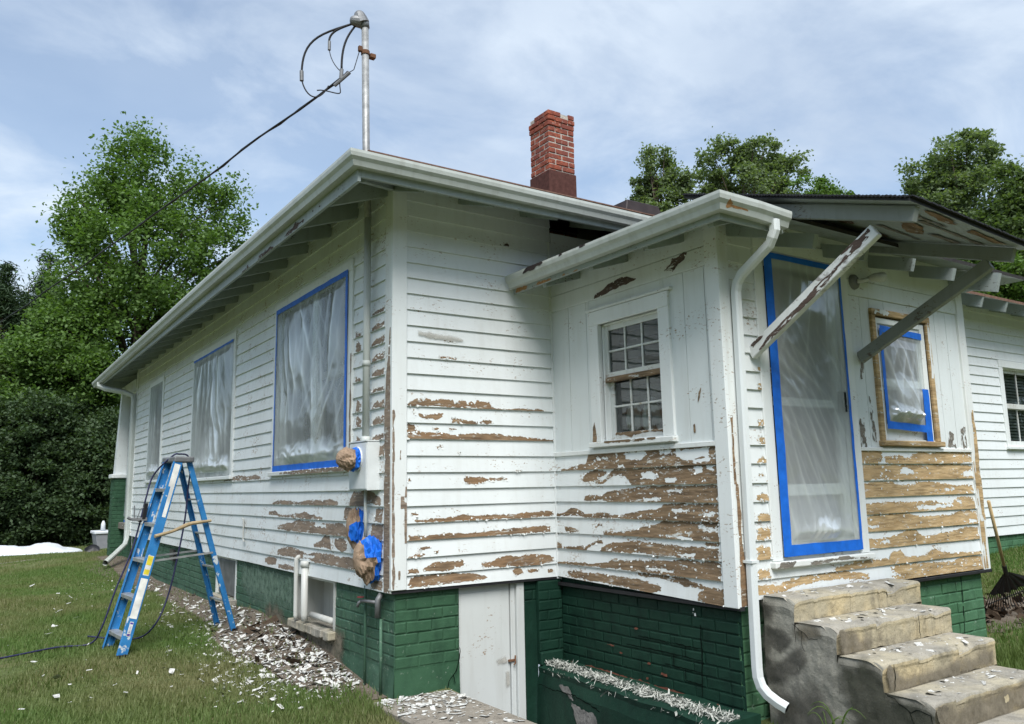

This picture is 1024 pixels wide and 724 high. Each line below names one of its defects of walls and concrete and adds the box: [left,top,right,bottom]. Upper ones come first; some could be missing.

peeling [516,261,577,293]
peeling [594,276,636,299]
peeling [664,252,687,272]
peeling [751,211,1006,350]
peeling [265,306,725,611]
peeling [730,396,989,607]
peeling [814,605,898,637]
peeling [869,636,968,679]
peeling [917,669,1018,697]